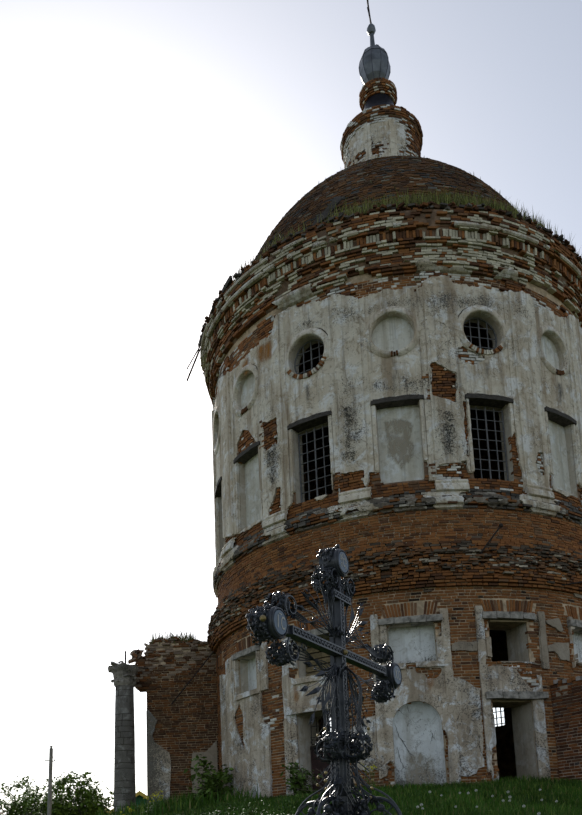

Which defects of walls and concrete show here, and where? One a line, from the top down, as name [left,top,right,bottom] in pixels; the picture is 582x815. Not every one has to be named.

spalling [237,418,278,464]
mould [338,402,360,466]
spalling [269,363,525,517]
mould [436,408,460,459]
spalling [536,452,582,508]
spalling [225,523,262,546]
spalling [476,618,582,697]
peeling [146,710,171,808]
peeling [191,674,245,797]
peeling [350,716,395,787]